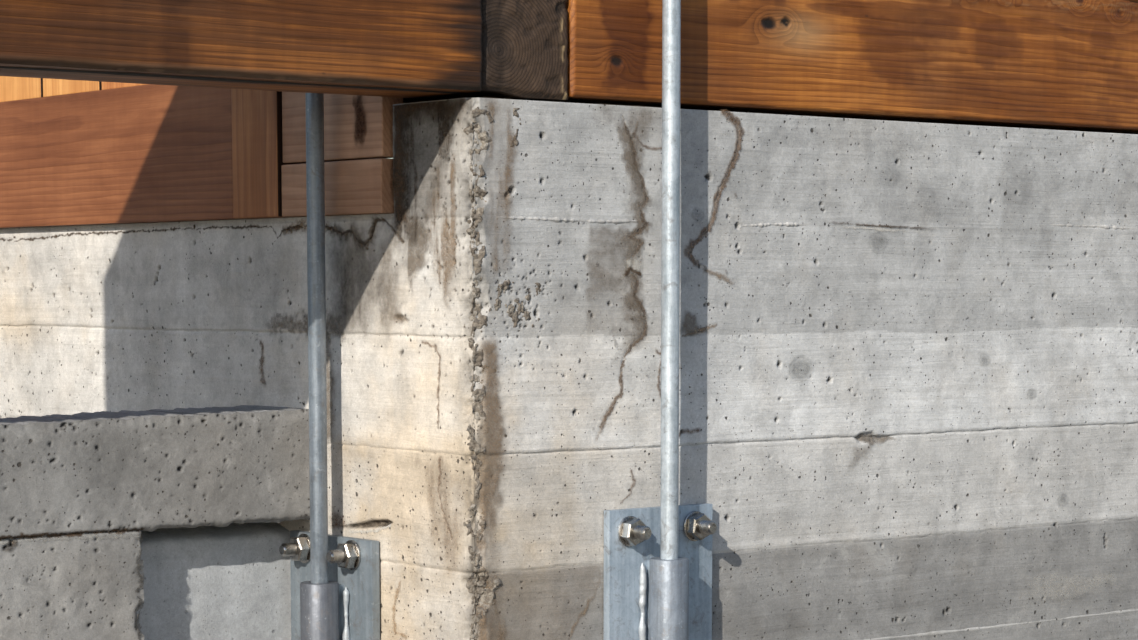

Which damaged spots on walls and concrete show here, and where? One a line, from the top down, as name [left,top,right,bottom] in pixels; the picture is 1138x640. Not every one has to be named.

crack [0,218,404,255]
water stain [273,315,308,333]
water stain [392,99,465,292]
spalling [463,107,541,640]
water stain [500,131,513,216]
crack [601,122,662,427]
crack [685,109,744,279]
crack [0,528,144,544]